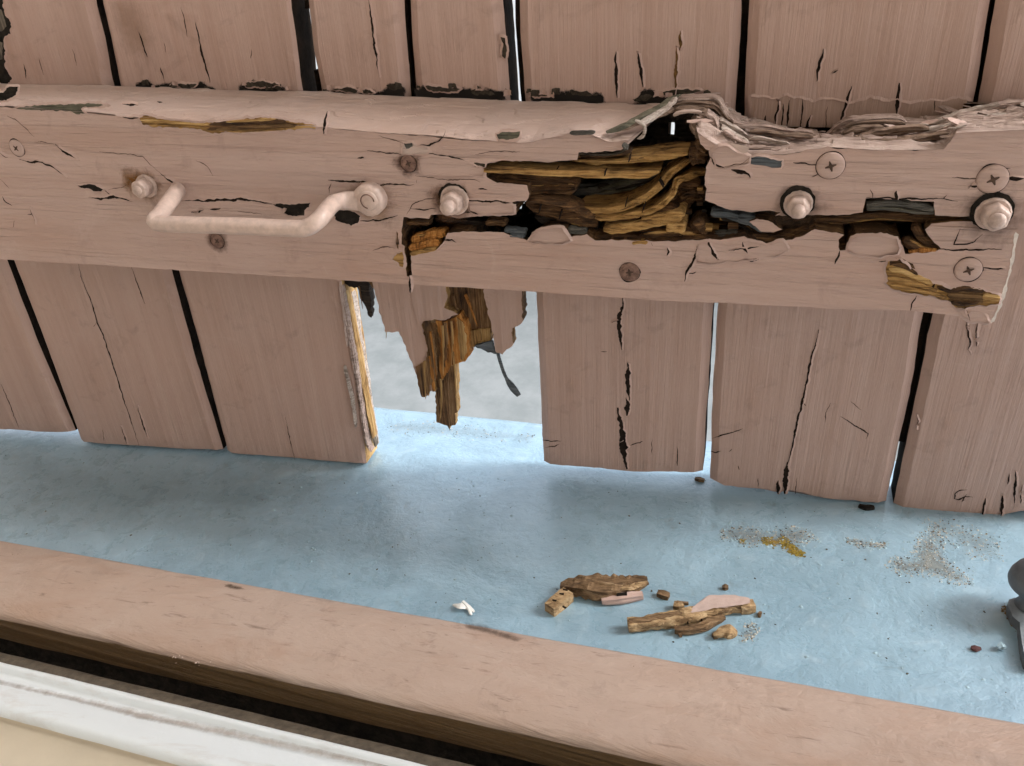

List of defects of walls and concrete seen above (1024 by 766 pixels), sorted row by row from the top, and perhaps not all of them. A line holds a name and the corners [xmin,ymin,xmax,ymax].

corrosion [125,173,140,190]
crack [0,117,275,227]
peeling [401,140,487,180]
peeling [468,201,516,217]
peeling [527,225,573,245]
peeling [695,238,791,266]
peeling [570,92,1024,171]
peeling [845,232,1019,325]
crack [79,269,150,445]
peeling [339,281,535,452]
crack [601,298,652,469]
crack [711,330,869,494]